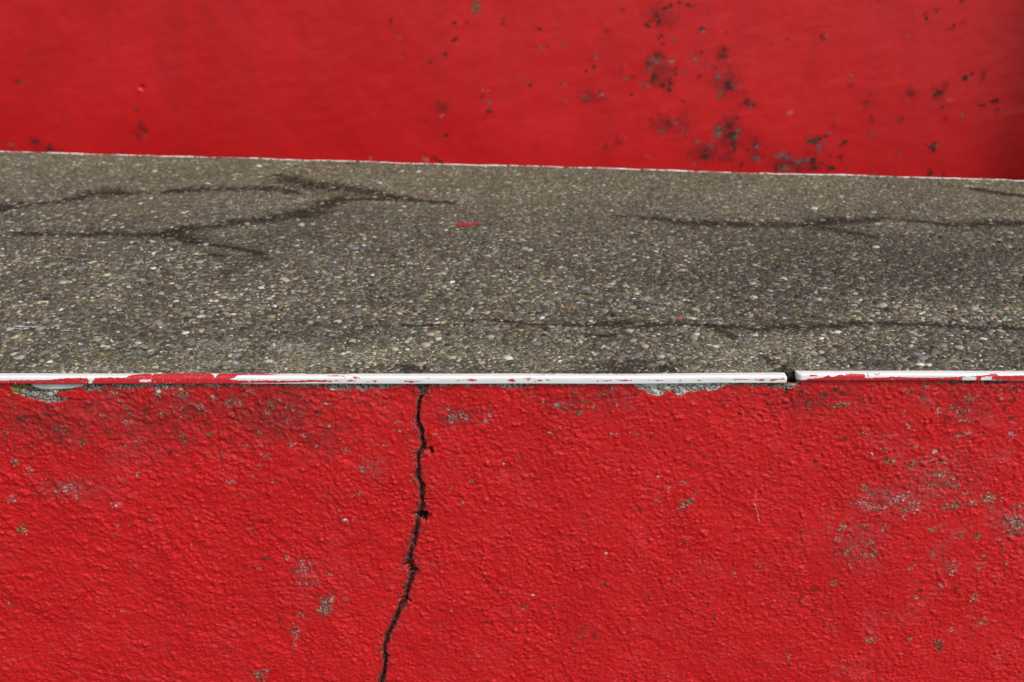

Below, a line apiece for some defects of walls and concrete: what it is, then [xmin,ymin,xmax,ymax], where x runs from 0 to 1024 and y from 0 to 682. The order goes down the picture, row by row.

spalling [11,384,413,440]
spalling [429,371,801,409]
crack [374,370,437,682]